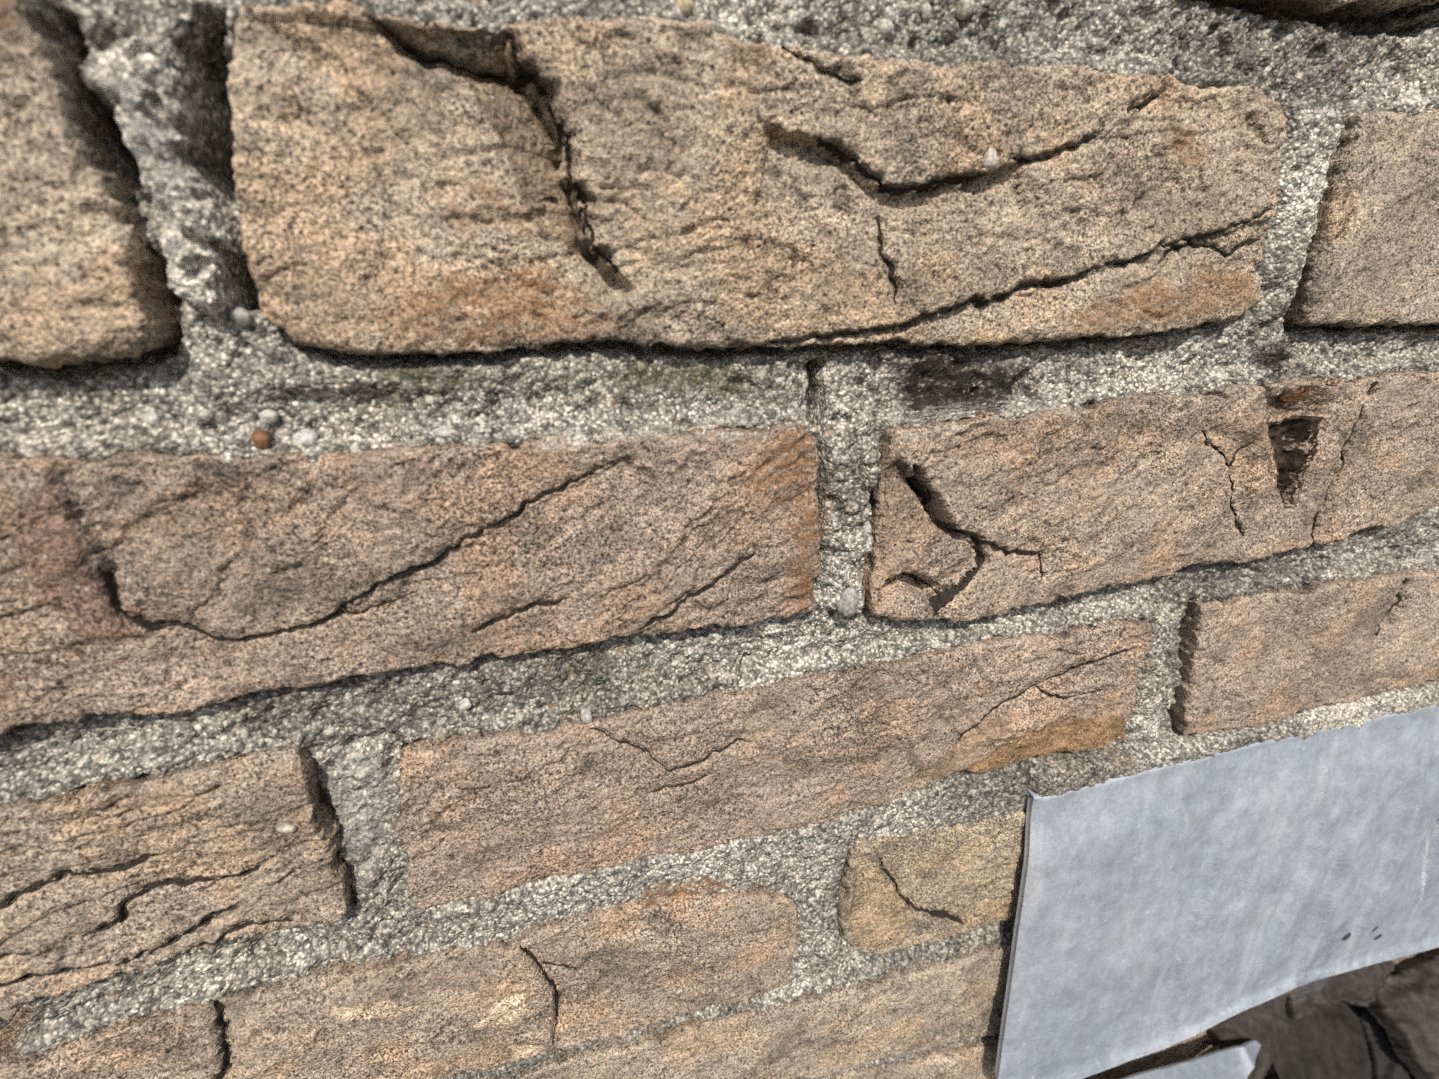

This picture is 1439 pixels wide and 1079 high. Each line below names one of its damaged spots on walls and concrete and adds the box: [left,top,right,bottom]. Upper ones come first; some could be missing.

crack [781,45,864,83]
crack [365,14,618,274]
crack [764,89,1274,344]
peeling [1277,378,1342,404]
crack [95,460,614,641]
crack [886,467,1043,616]
crack [1201,430,1254,536]
crack [1310,381,1379,546]
crack [590,728,750,794]
crack [0,853,293,987]
crack [878,857,964,924]